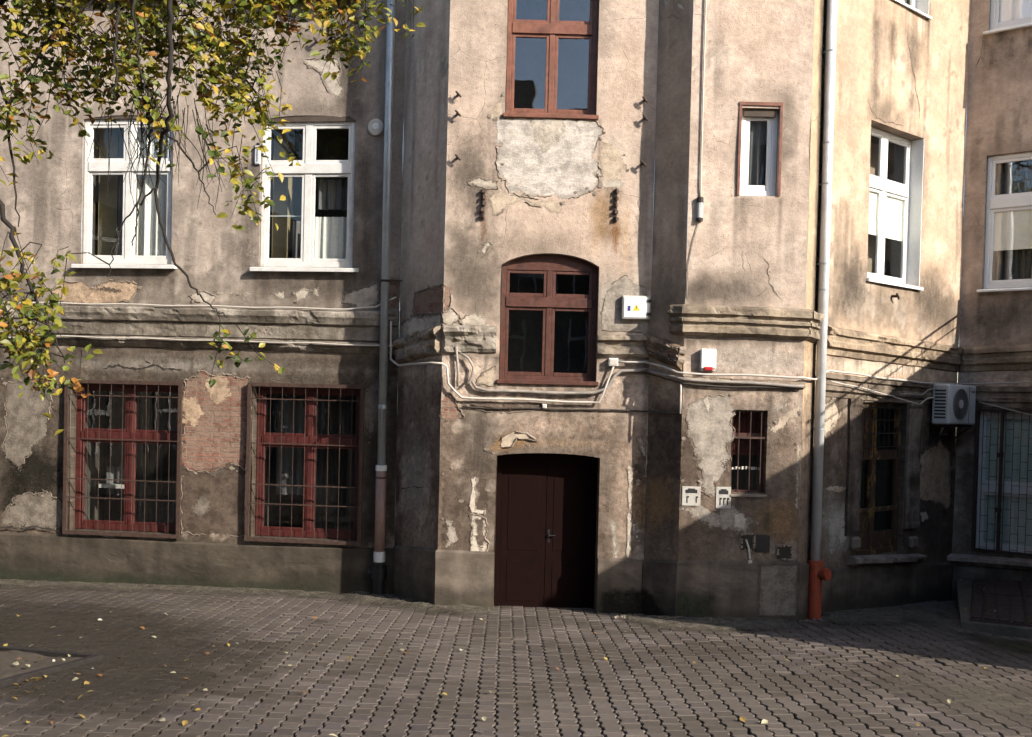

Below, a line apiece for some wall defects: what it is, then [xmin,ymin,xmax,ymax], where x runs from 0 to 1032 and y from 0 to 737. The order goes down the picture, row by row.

peeling [302,58,343,98]
crack [867,45,920,126]
peeling [467,92,629,215]
spalling [42,279,142,305]
spalling [342,277,490,338]
peeling [1,376,53,472]
peeling [0,489,63,530]
spalling [176,370,252,537]
peeling [484,431,538,454]
peeling [612,394,803,617]
spalling [920,438,952,522]